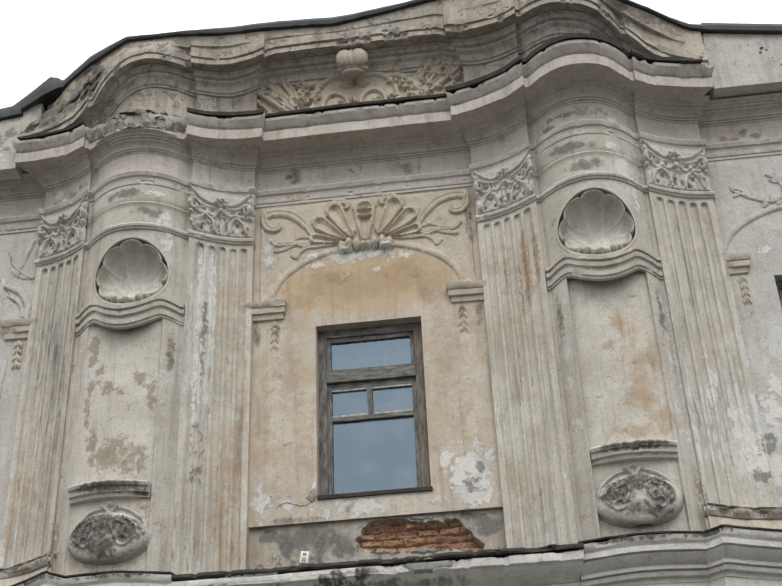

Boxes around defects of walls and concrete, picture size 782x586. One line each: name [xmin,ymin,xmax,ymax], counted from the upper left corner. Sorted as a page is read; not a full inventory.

spalling [86,109,187,143]
peeling [699,349,782,489]
flaking render [277,482,317,508]
peeling [439,449,493,505]
flaking render [187,514,483,586]
leakage [315,567,398,586]